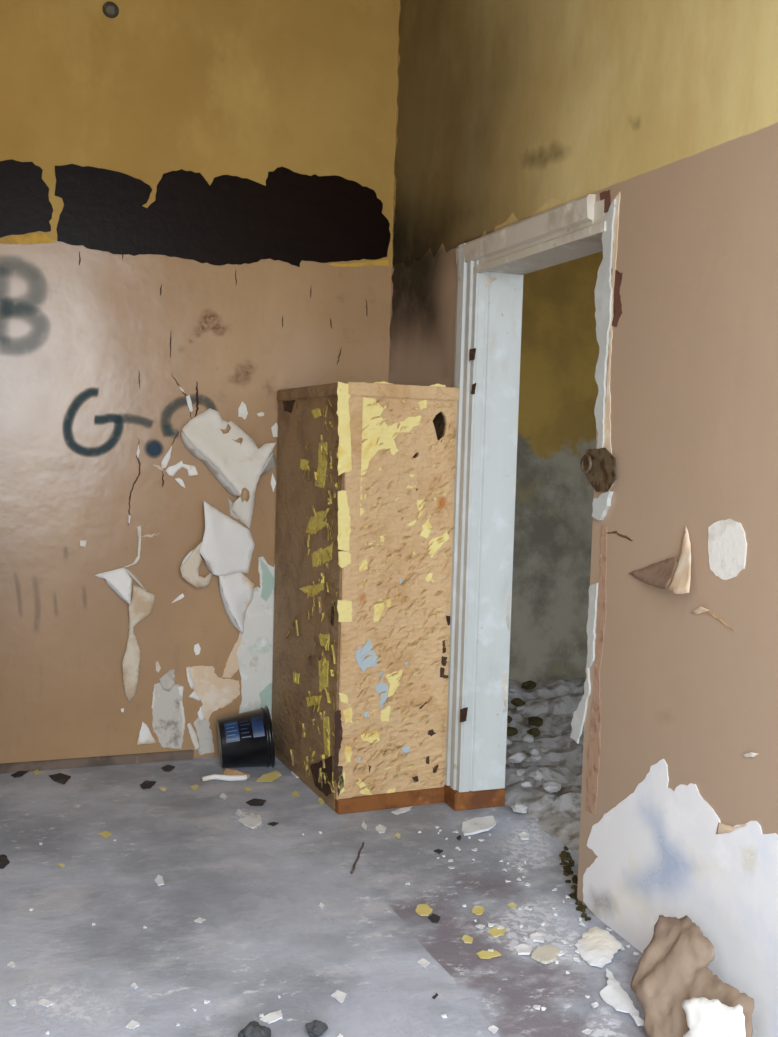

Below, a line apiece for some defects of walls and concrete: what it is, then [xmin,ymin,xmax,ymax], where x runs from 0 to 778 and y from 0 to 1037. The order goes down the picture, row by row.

crack [123,443,162,568]
peeling [154,431,198,488]
crack [172,375,199,419]
peeling [238,401,264,420]
flaking render [137,557,275,755]
flaking render [583,518,778,1037]